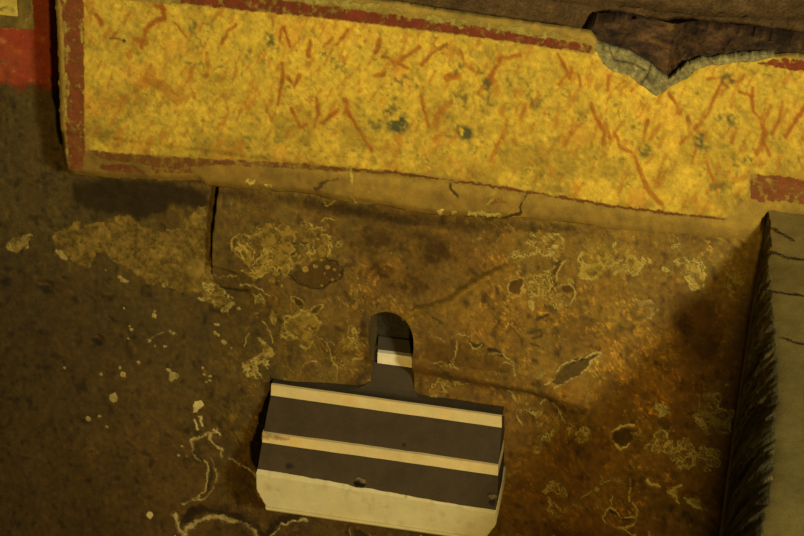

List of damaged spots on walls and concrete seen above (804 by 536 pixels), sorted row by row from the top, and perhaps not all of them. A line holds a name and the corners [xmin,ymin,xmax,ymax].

flaking render [587,12,804,96]
flaking render [52,206,241,312]
crack [210,247,270,297]
flaking render [230,217,334,257]
flaking render [611,423,635,451]